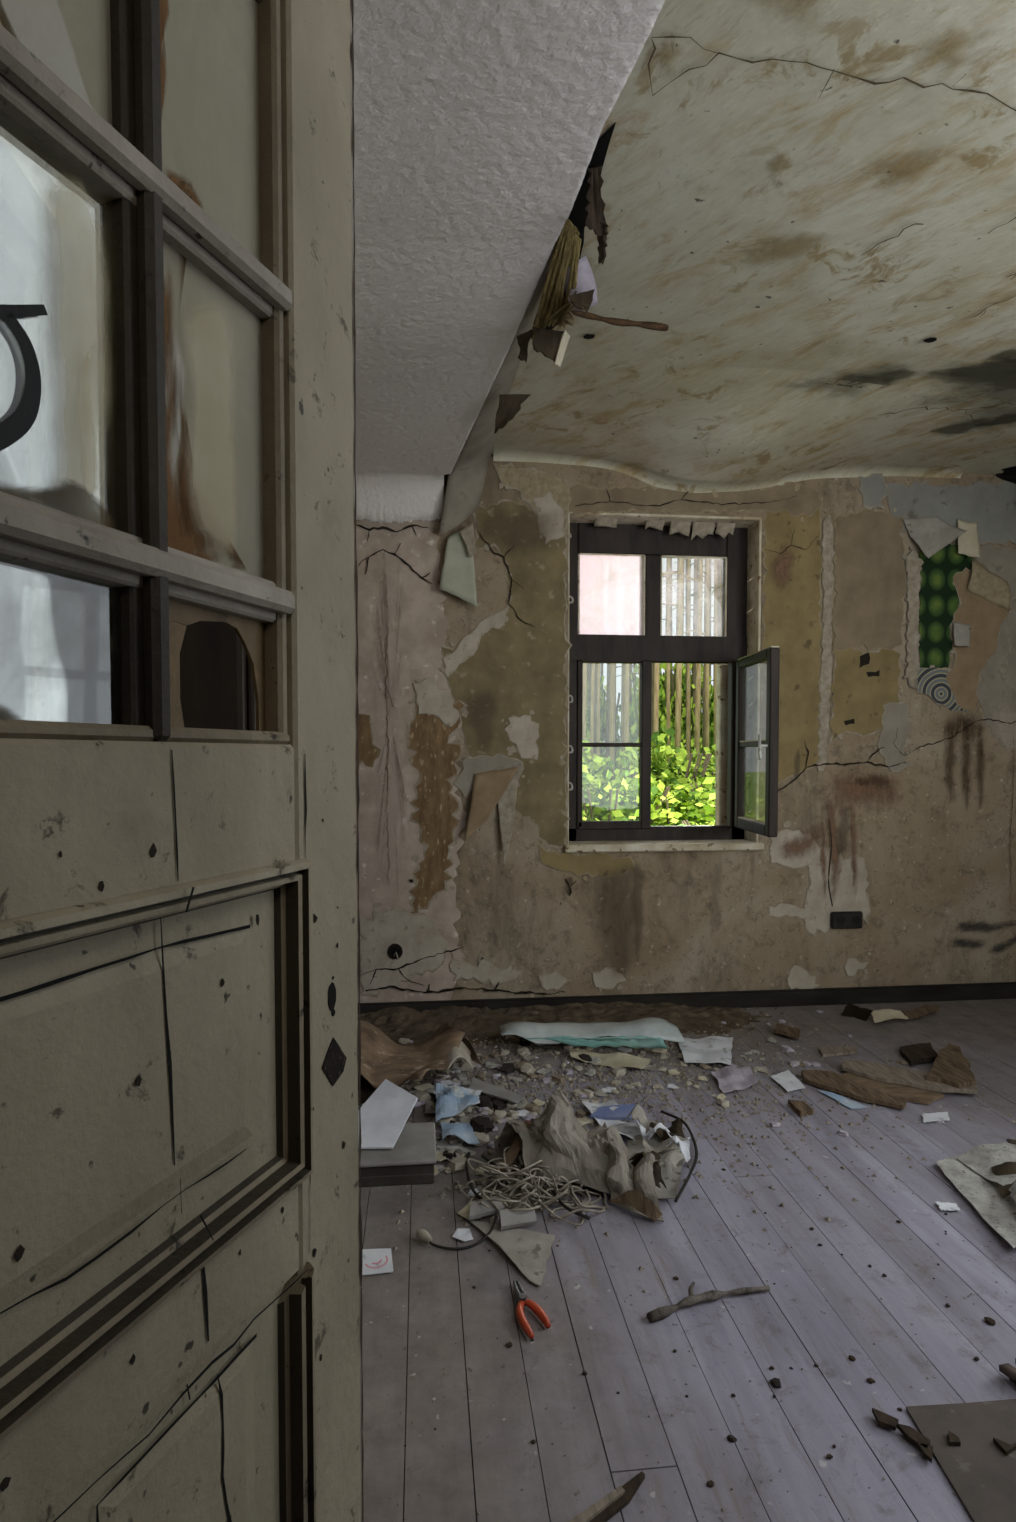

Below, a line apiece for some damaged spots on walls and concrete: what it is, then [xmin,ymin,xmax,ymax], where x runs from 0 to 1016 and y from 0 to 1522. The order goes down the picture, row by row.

crack [648,36,1016,111]
leakage [816,370,913,388]
leakage [934,350,1016,434]
flaking render [858,473,1016,749]
flaking render [354,468,636,1003]
leakage [946,717,983,803]
spalling [738,817,871,937]
crack [361,947,565,995]
peeling [13,1245,25,1262]